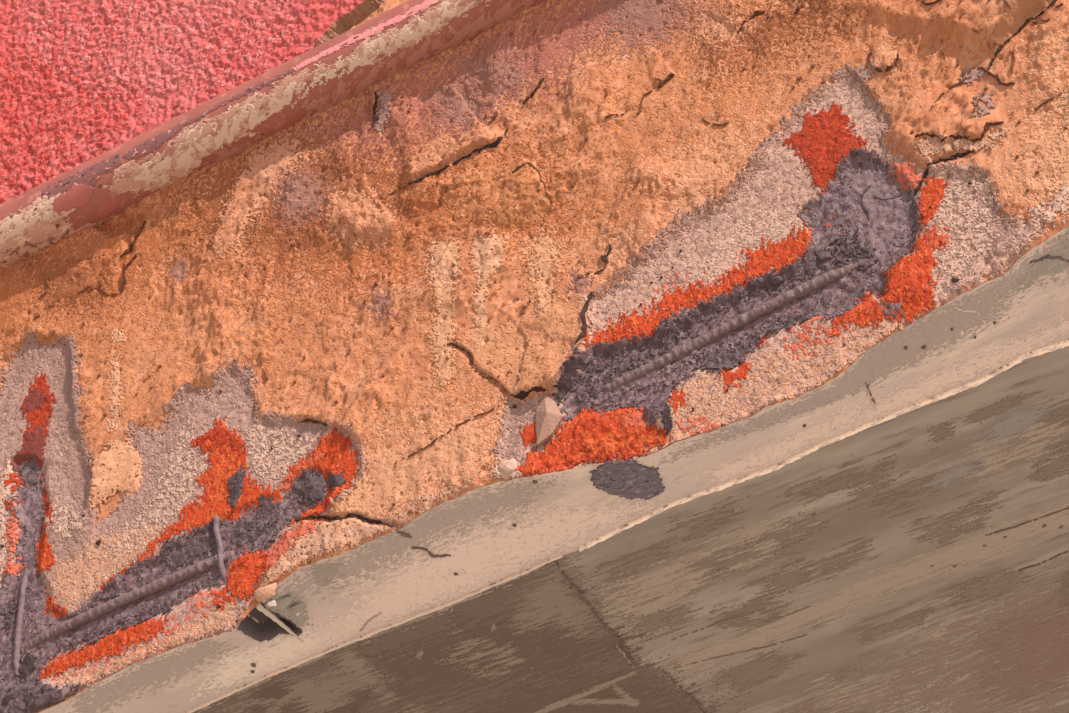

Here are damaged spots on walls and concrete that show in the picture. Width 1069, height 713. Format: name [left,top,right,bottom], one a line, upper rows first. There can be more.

crack [522,77,545,104]
crack [914,0,1063,142]
crack [388,111,553,207]
spalling [488,58,1069,484]
crack [395,343,547,468]
spalling [0,303,473,713]
crack [290,513,451,558]